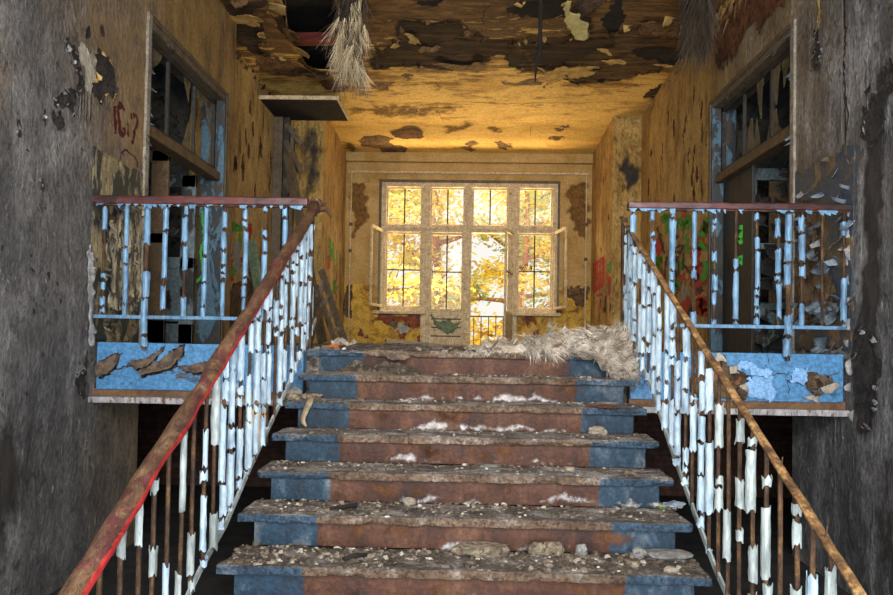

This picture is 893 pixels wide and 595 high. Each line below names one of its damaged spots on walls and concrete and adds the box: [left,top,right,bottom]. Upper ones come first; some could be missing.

peeling [712,0,785,72]
peeling [359,129,424,153]
peeling [454,141,480,152]
peeling [548,125,570,141]
peeling [647,87,707,202]